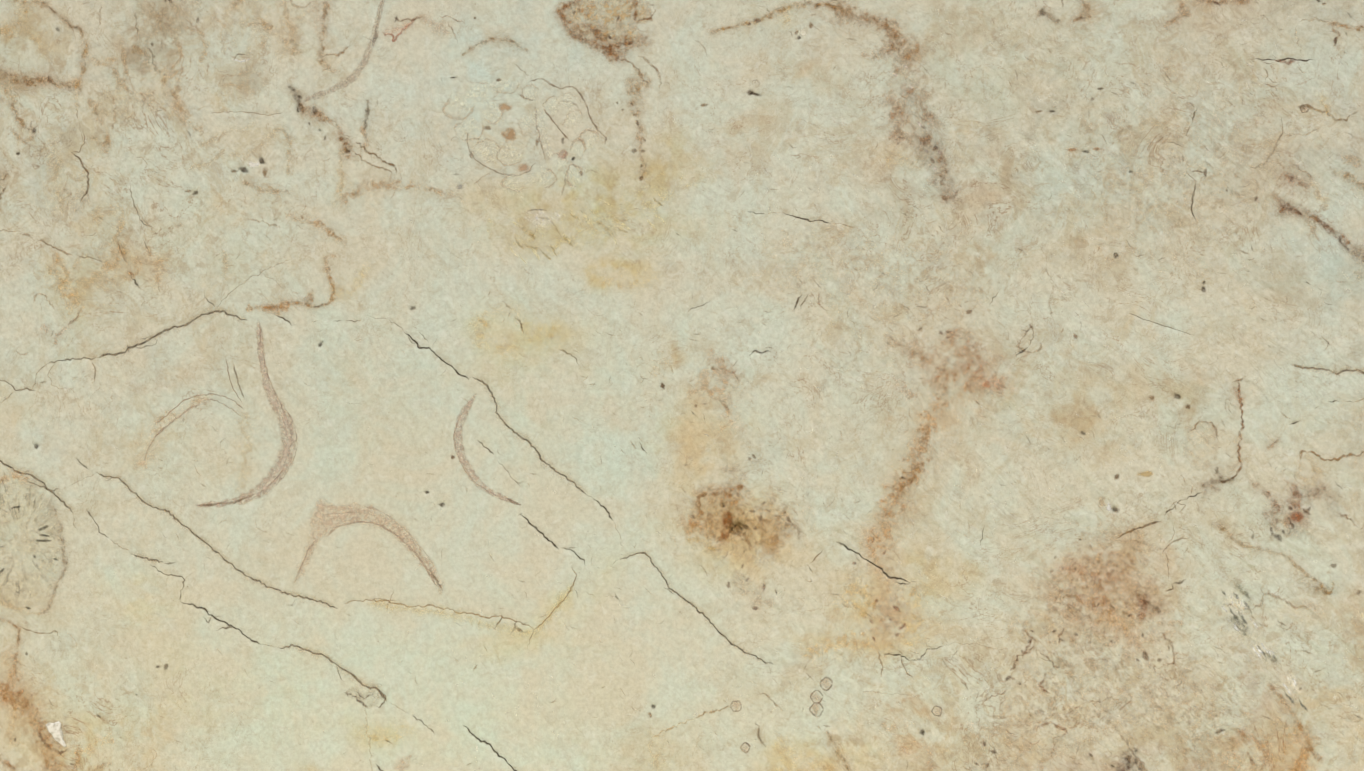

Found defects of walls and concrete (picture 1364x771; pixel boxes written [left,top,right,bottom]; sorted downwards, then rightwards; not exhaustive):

crack [0,300,245,391]
crack [407,334,611,518]
crack [0,460,107,537]
crack [82,464,585,631]
crack [135,555,385,698]
crack [627,552,766,663]
crack [468,728,517,771]